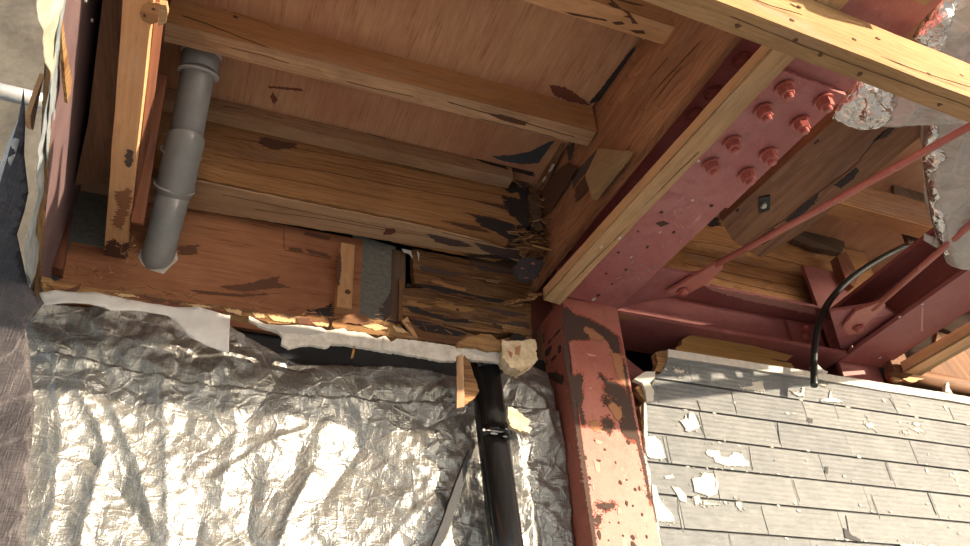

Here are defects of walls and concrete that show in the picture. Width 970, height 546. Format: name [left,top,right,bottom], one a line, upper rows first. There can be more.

leakage [104,188,133,259]
leakage [378,141,598,341]
leakage [191,276,290,297]
rust [536,307,653,546]
spalling [631,350,688,546]
spalling [677,412,701,432]
spalling [739,380,765,394]
spalling [820,389,844,406]
spalling [689,449,749,512]
spalling [843,528,862,542]